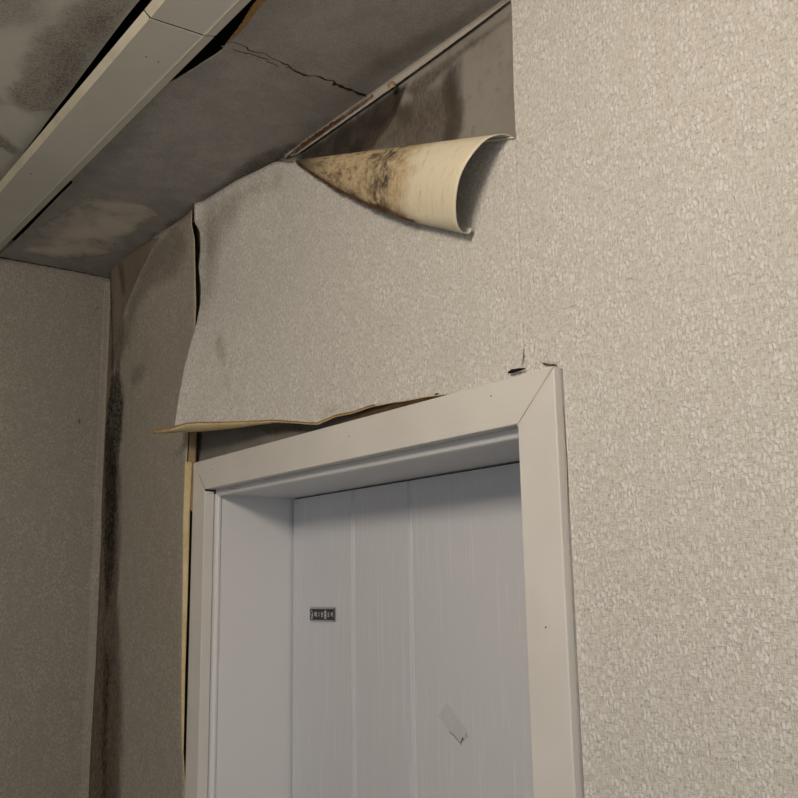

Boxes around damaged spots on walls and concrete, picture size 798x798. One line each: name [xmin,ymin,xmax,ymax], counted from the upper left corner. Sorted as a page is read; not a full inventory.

water stain [0,0,502,283]
crack [233,42,367,97]
flaking render [281,1,516,163]
flaking render [203,401,420,460]
water stain [91,373,123,798]